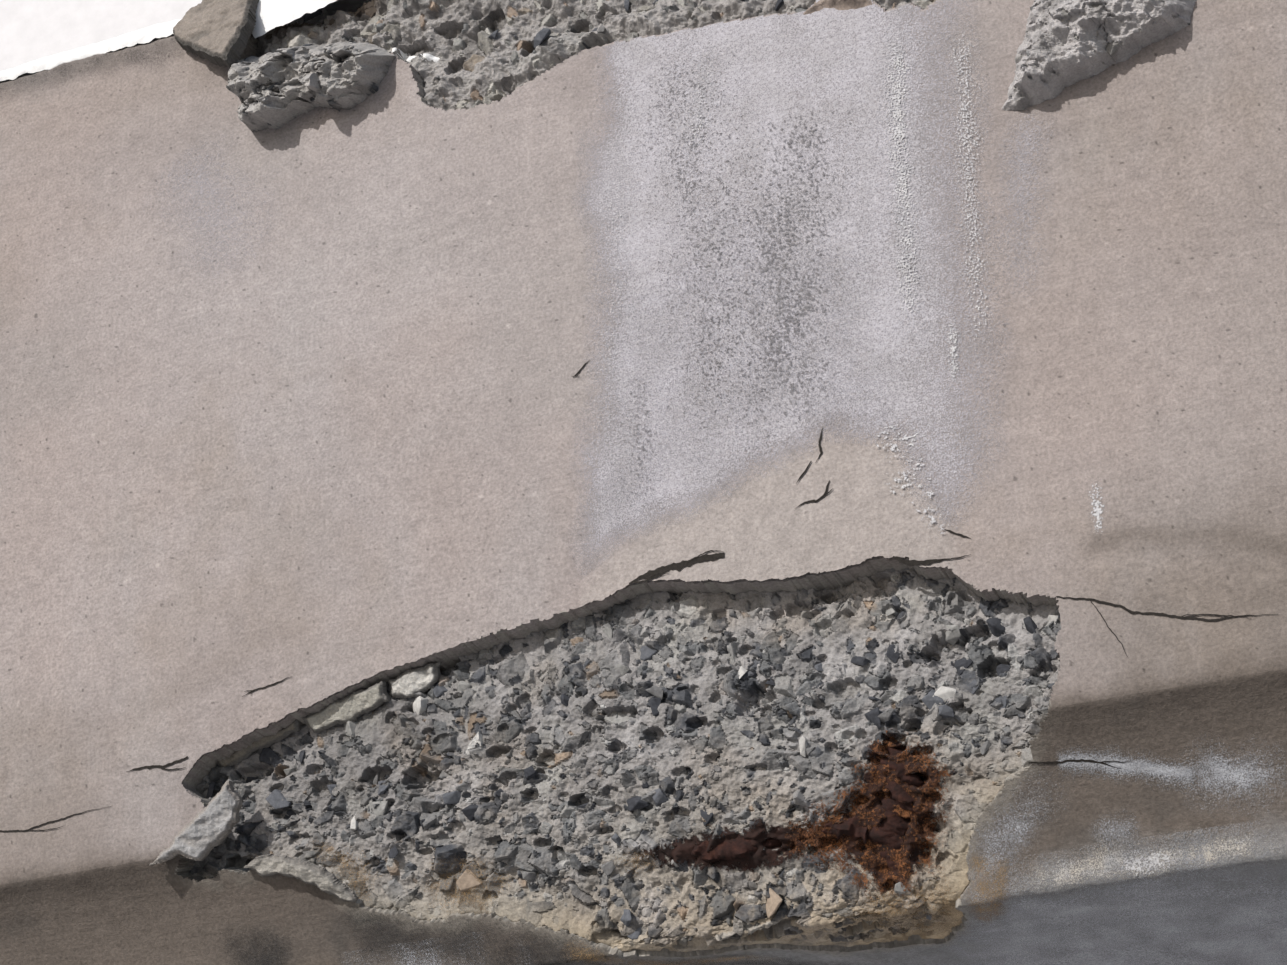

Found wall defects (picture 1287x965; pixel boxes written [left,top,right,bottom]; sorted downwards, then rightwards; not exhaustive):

spalling [173,0,936,132]
spalling [1002,0,1197,111]
water stain [574,0,1049,574]
crack [796,428,832,508]
crack [629,550,724,584]
crack [1056,596,1278,657]
crack [0,806,111,832]
crack [127,756,188,772]
spalling [149,568,1061,952]
corrosion [620,729,959,932]
water stain [873,783,1287,965]